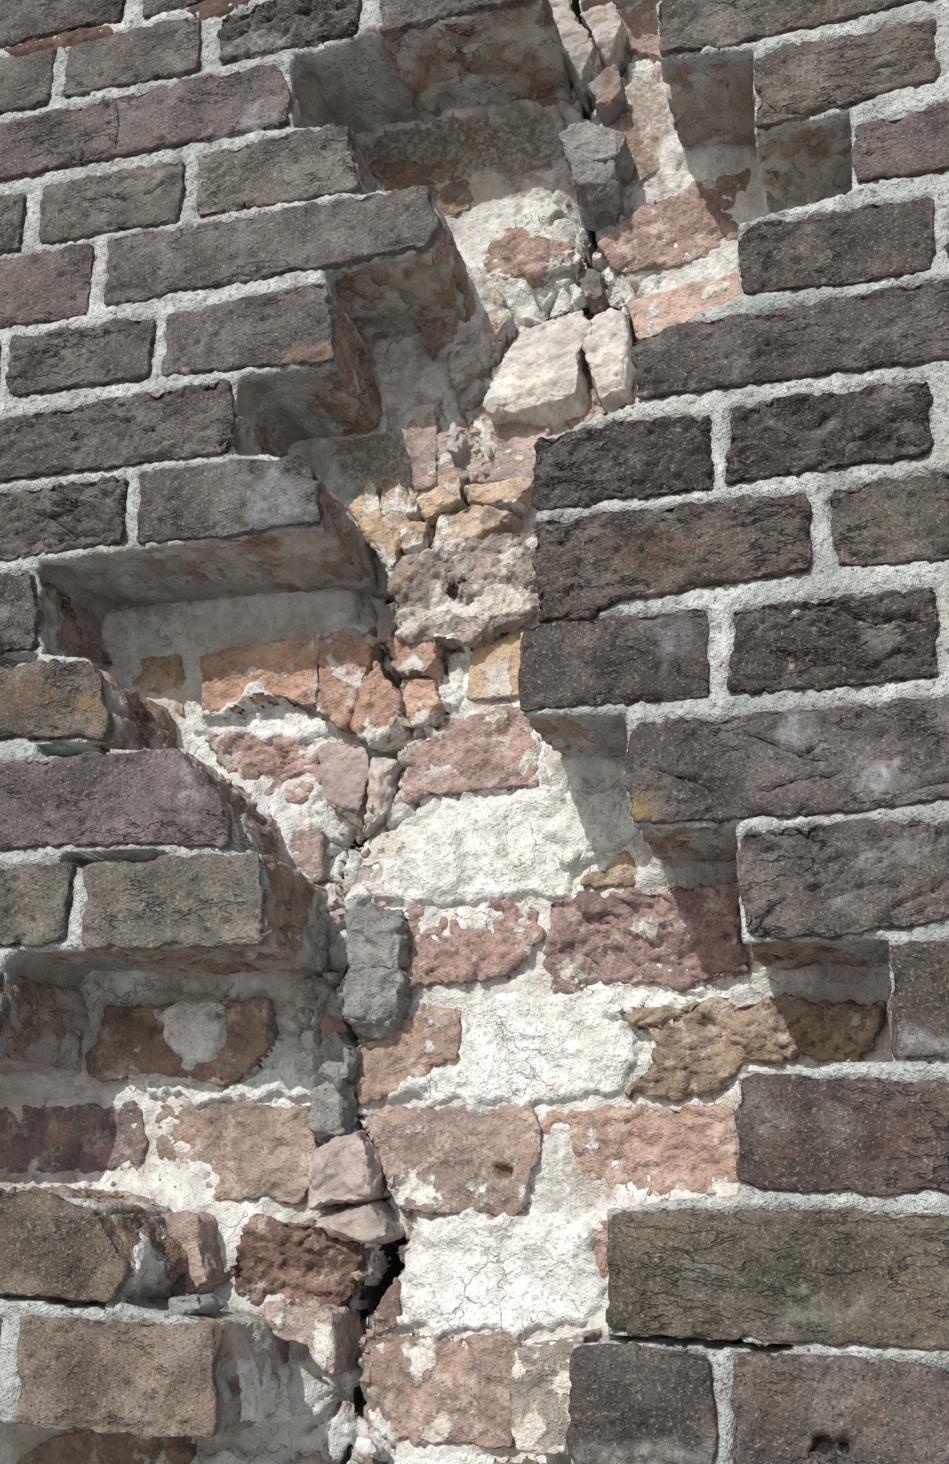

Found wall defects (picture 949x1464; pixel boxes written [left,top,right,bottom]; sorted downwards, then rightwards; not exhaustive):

spalling [2,23,118,58]
spalling [187,0,251,26]
crack [571,0,584,27]
spalling [597,112,751,342]
spalling [415,227,588,394]
crack [545,305,622,321]
spalling [405,380,637,493]
crack [200,473,533,763]
crack [342,839,367,880]
peeling [0,531,887,1464]
crack [356,1199,407,1329]
crack [342,1386,367,1464]